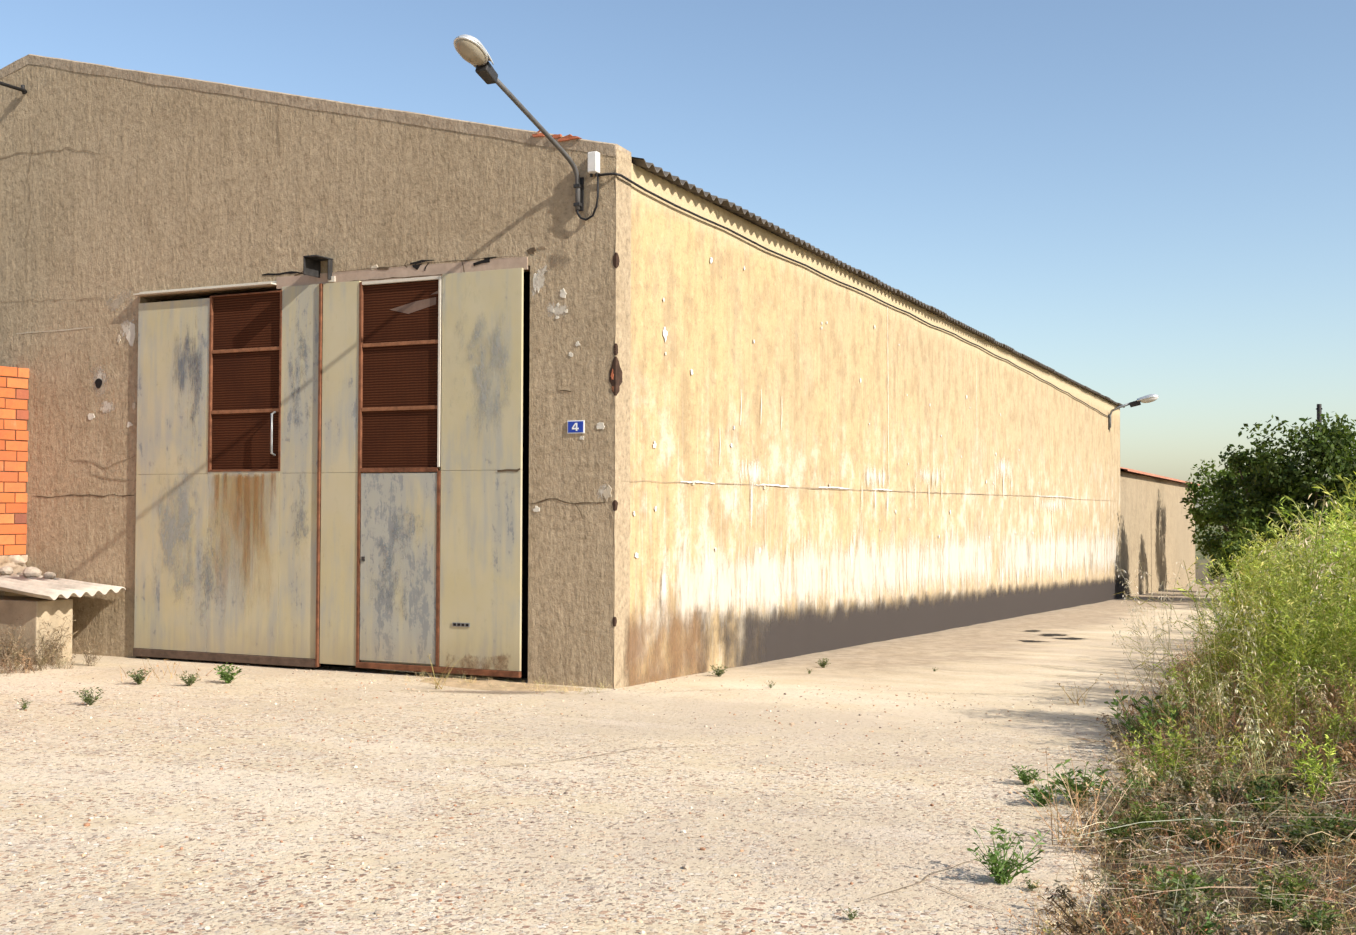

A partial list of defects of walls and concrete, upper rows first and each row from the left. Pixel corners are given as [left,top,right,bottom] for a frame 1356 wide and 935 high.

crack [0,119,110,303]
water stain [661,500,1129,667]